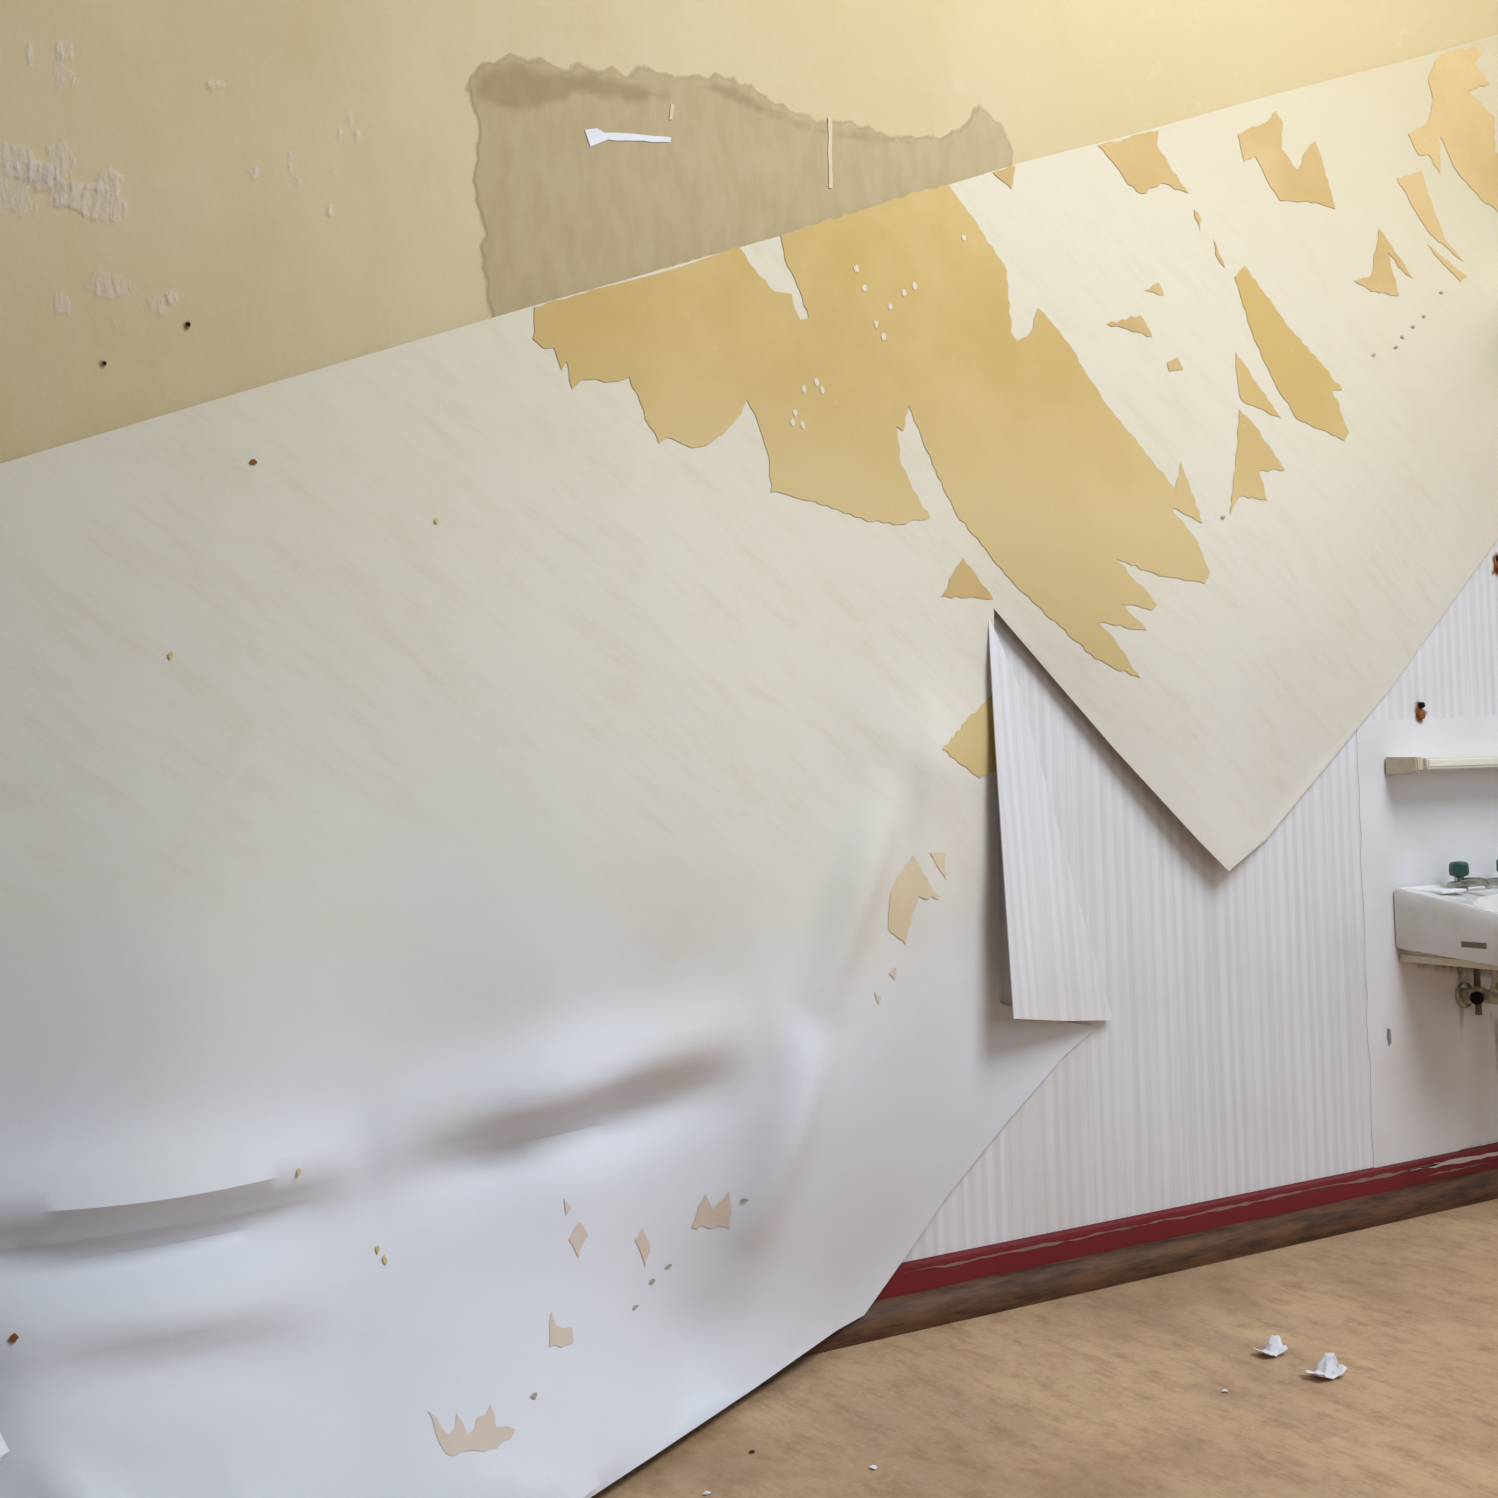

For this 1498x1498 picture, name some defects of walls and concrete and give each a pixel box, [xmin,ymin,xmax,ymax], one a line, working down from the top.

damp [469,53,1013,317]
peeling [903,1152,1498,1274]